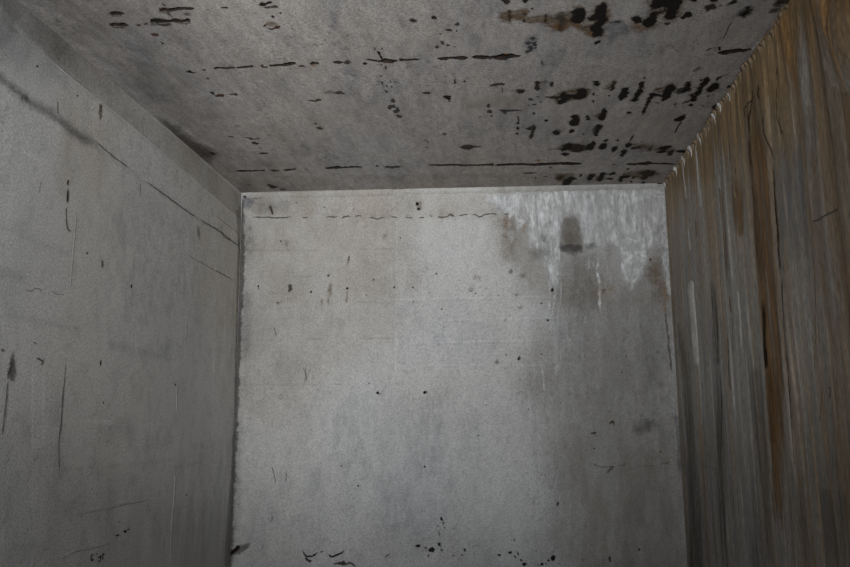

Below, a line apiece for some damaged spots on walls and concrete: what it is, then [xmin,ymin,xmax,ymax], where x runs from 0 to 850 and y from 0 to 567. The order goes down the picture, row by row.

rust [499,9,572,30]
spalling [706,47,752,56]
leakage [487,0,789,330]
spalling [611,161,677,170]
crack [150,184,194,216]
crack [257,212,508,220]